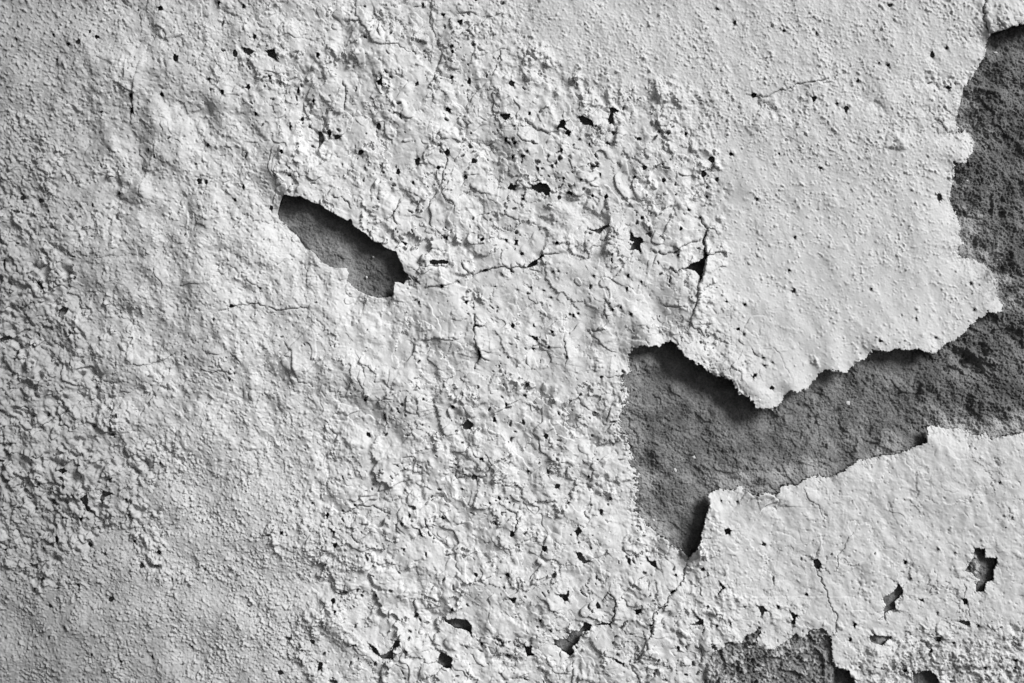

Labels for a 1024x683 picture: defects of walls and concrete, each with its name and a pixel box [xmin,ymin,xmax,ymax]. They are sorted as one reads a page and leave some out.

spalling [269,117,419,308]
crack [427,253,559,288]
crack [654,217,726,289]
spalling [551,17,1024,576]
peeling [962,548,996,605]
spalling [698,577,1024,683]